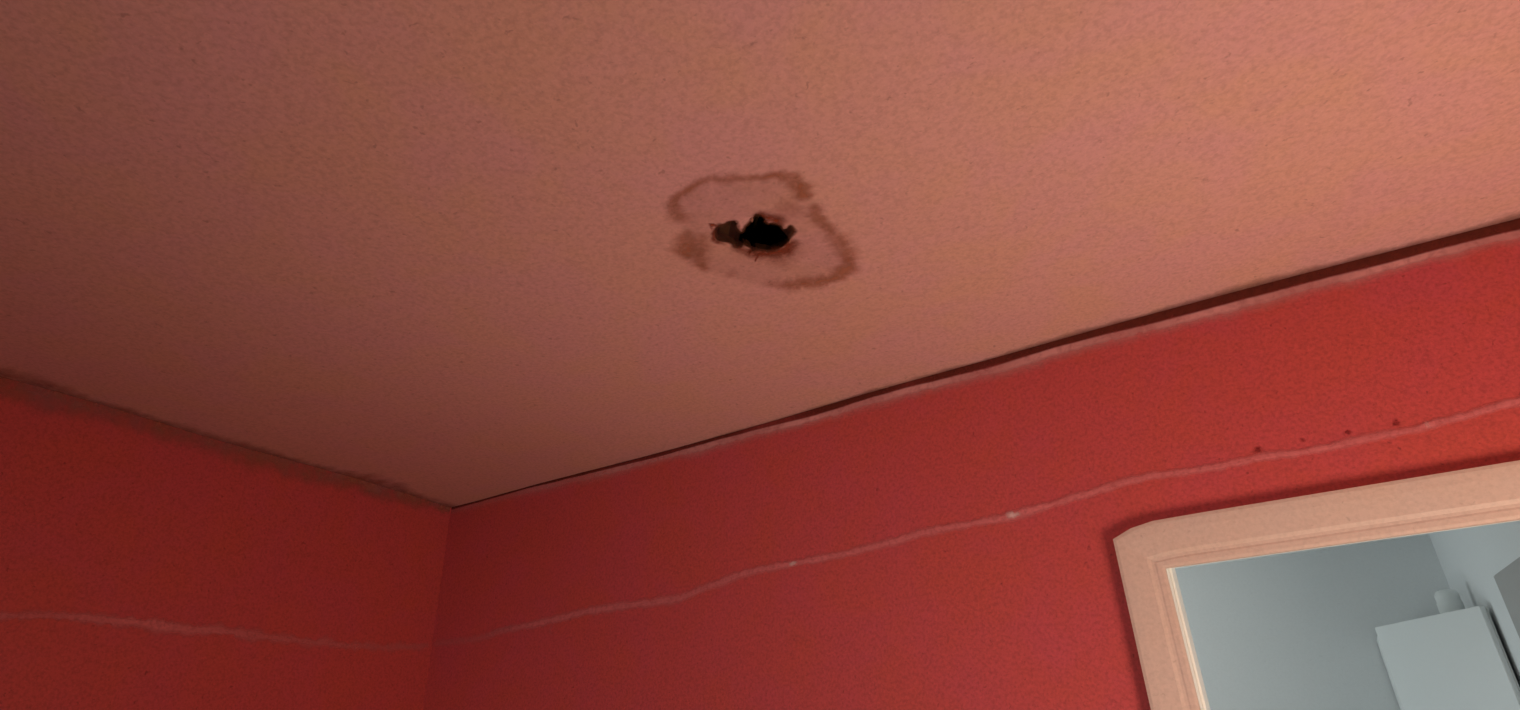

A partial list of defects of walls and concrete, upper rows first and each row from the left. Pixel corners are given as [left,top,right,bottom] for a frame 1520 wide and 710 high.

spalling [715,214,793,252]
water stain [752,173,854,287]
crack [490,398,1520,636]
crack [0,612,368,648]